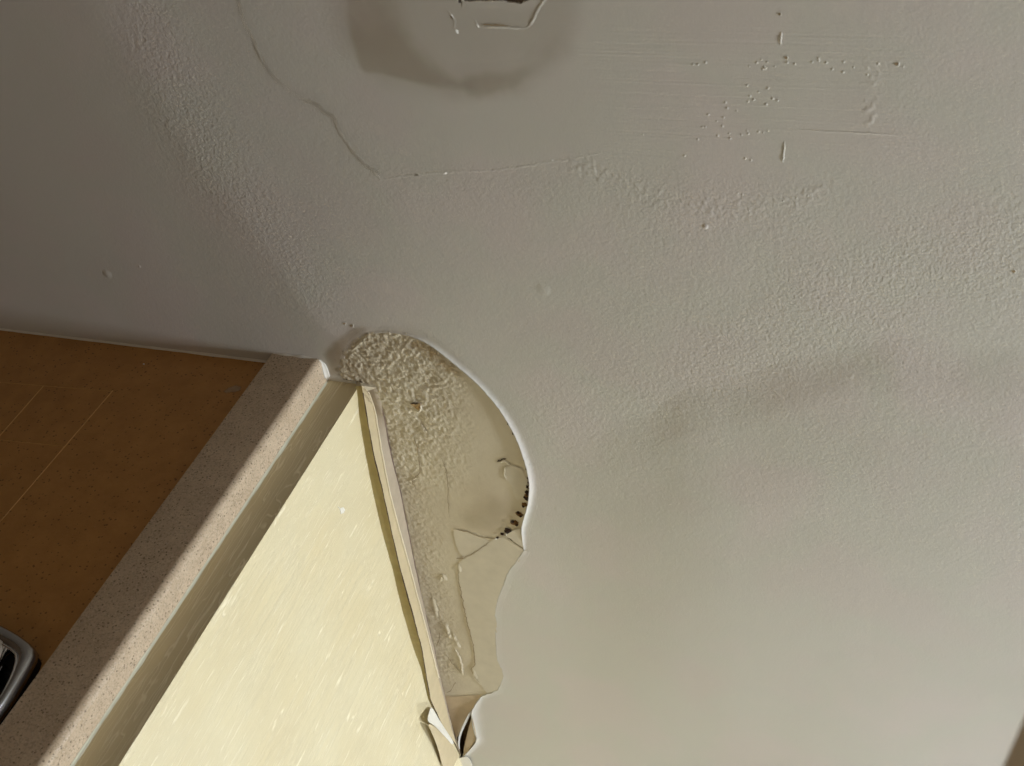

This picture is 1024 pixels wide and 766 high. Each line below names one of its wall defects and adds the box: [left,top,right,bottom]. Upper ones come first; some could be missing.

crack [445,0,546,35]
peeling [337,322,540,759]